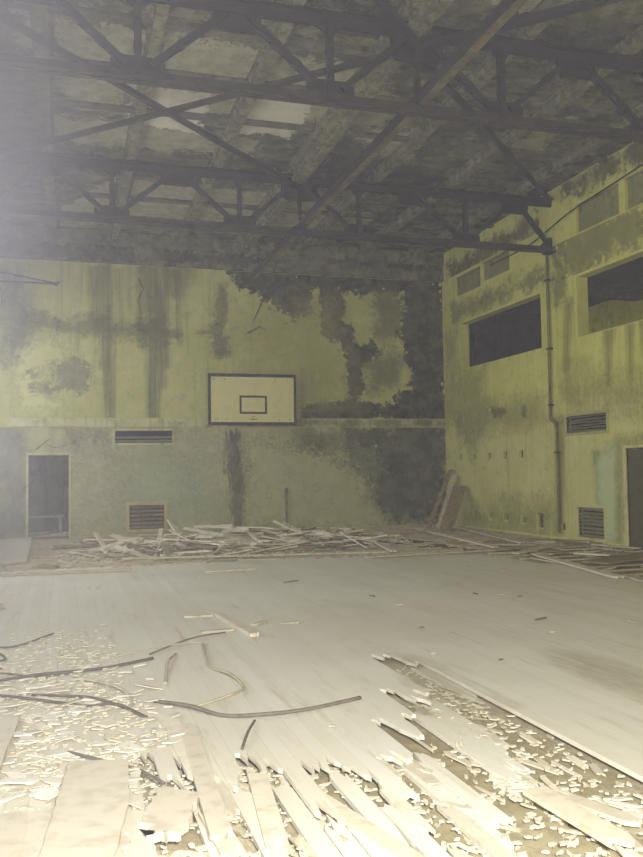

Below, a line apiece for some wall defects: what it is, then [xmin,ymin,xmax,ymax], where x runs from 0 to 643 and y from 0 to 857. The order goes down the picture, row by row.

damp [0,240,280,418]
damp [276,211,539,525]
damp [223,428,246,527]